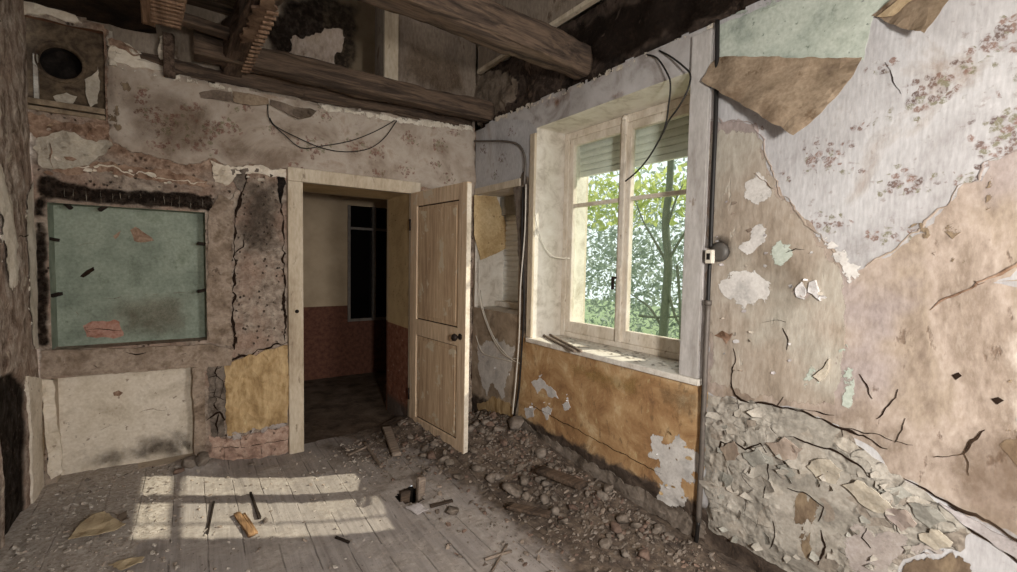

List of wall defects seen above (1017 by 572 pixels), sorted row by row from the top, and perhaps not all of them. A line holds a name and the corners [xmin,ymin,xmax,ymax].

flaking render [703,0,890,60]
flaking render [28,106,122,172]
crack [217,174,288,369]
peeling [477,129,971,572]
flaking render [206,366,289,461]
crack [731,348,908,449]
crack [904,478,1017,562]